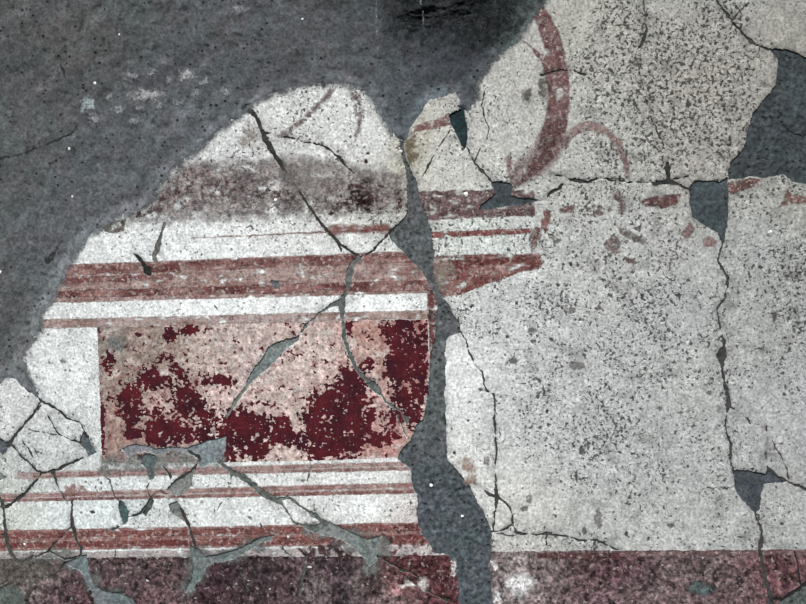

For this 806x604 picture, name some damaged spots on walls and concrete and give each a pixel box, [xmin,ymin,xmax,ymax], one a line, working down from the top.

water stain [392,0,524,51]
crack [0,398,88,585]
crack [107,450,330,595]
peeling [80,138,493,604]
crack [244,107,409,440]
spalling [449,108,468,149]
spalling [479,181,539,210]
crack [459,331,619,550]
crack [547,71,692,197]
spalling [689,49,806,240]
spalling [733,470,785,511]
crack [716,240,806,491]